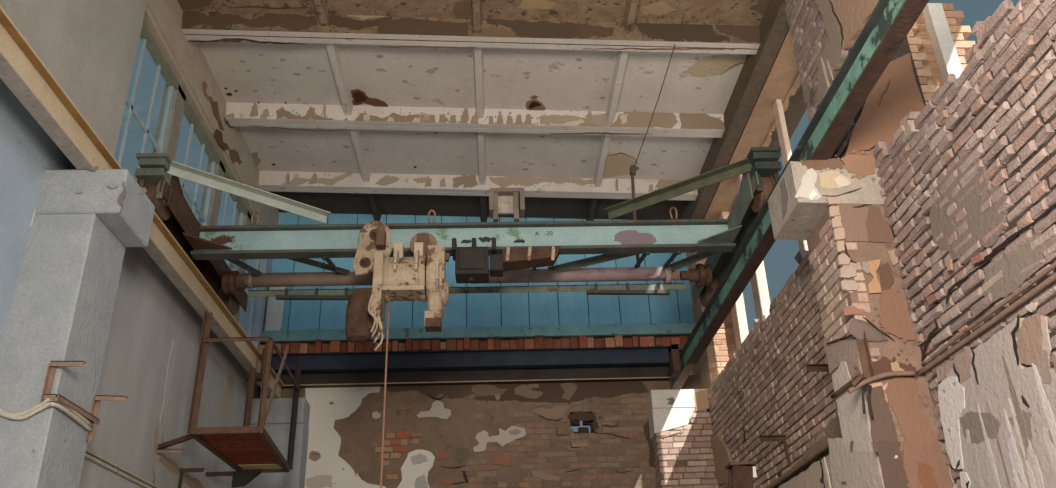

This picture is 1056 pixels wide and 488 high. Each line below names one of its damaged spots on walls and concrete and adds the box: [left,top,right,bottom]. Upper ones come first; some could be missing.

crack [821,0,844,87]
spalling [202,81,242,164]
spalling [351,89,388,107]
spalling [525,95,545,111]
peeling [795,53,925,294]
crack [921,203,1056,365]
peeling [304,387,451,488]
peeling [473,426,526,452]
peeling [474,384,543,401]
spalling [570,419,592,447]
peeling [778,339,910,488]
peeling [928,302,1056,488]